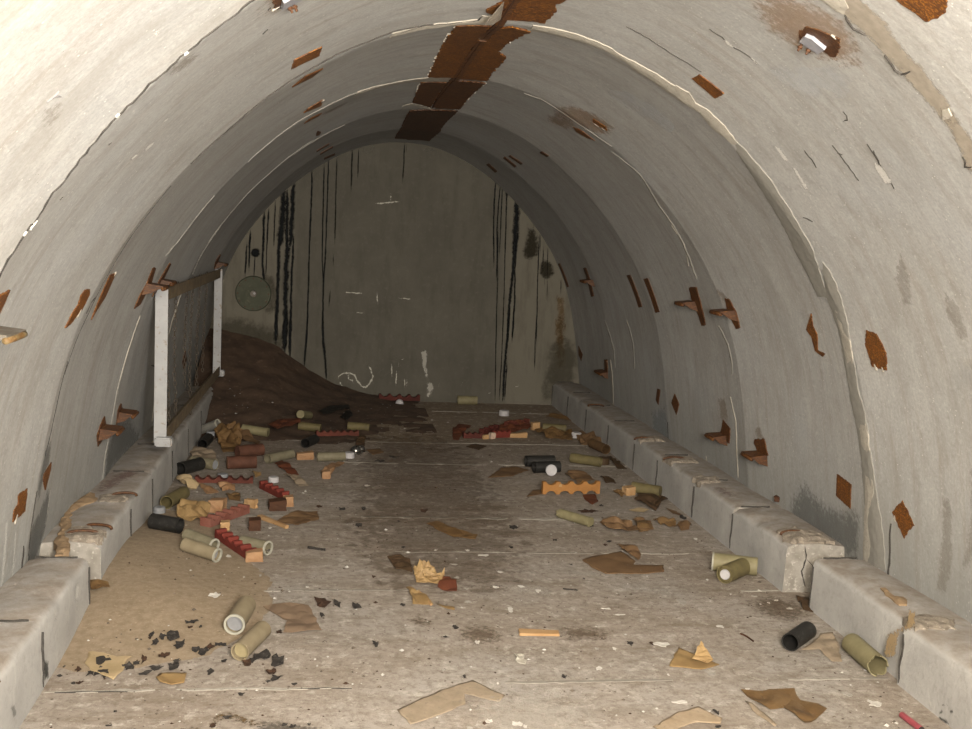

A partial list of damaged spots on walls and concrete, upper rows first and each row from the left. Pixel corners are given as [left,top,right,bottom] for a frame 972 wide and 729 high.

damp [245,184,295,355]
damp [304,161,337,379]
damp [493,183,553,401]